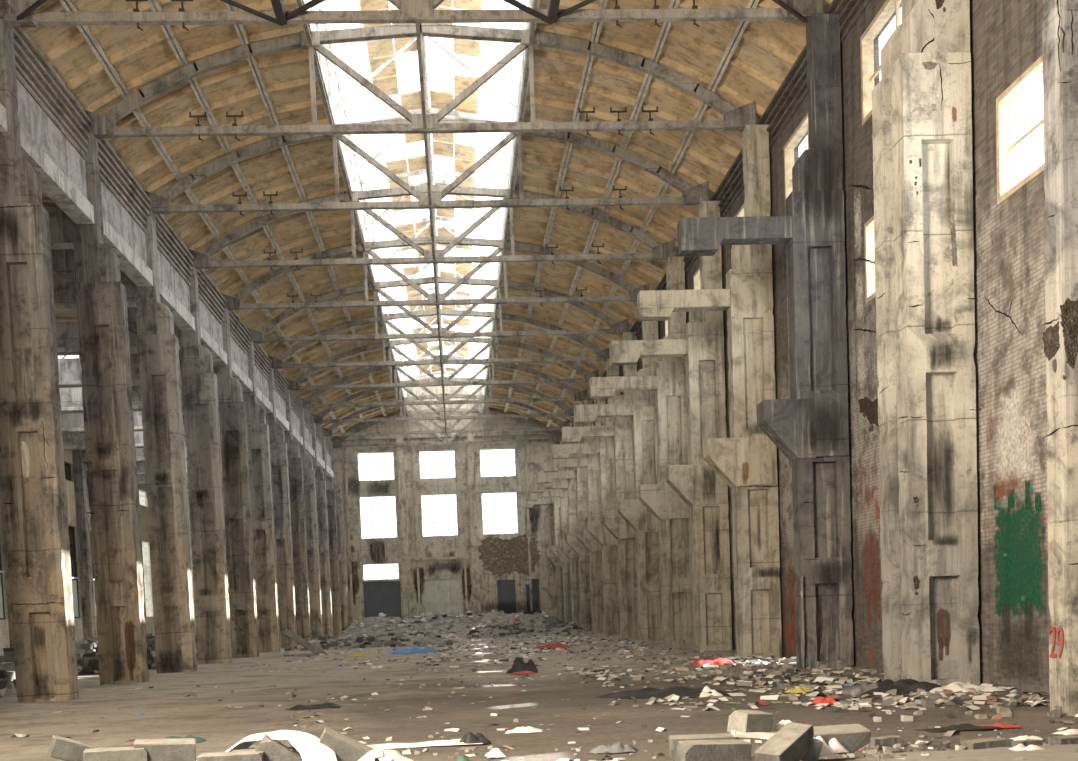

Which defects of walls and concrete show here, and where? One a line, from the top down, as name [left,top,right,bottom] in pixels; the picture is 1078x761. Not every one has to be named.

crack [967,295,1059,335]
spalling [1042,298,1078,380]
spalling [858,397,879,432]